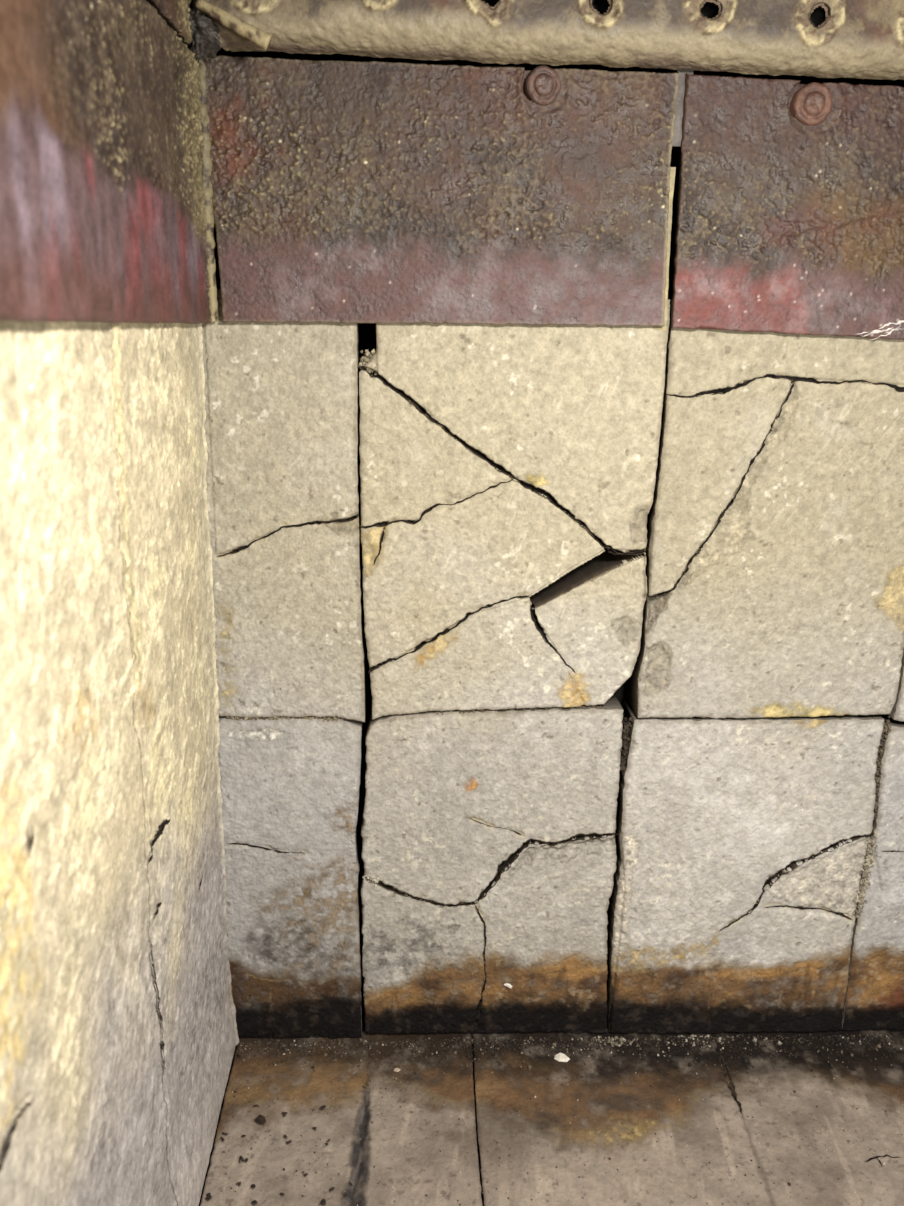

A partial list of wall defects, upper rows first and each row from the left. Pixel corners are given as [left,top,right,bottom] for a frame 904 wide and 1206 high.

crack [216,366,646,673]
crack [648,374,904,598]
crack [150,902,166,1080]
crack [149,817,171,863]
crack [227,843,304,854]
crack [362,817,618,1025]
crack [718,833,903,932]